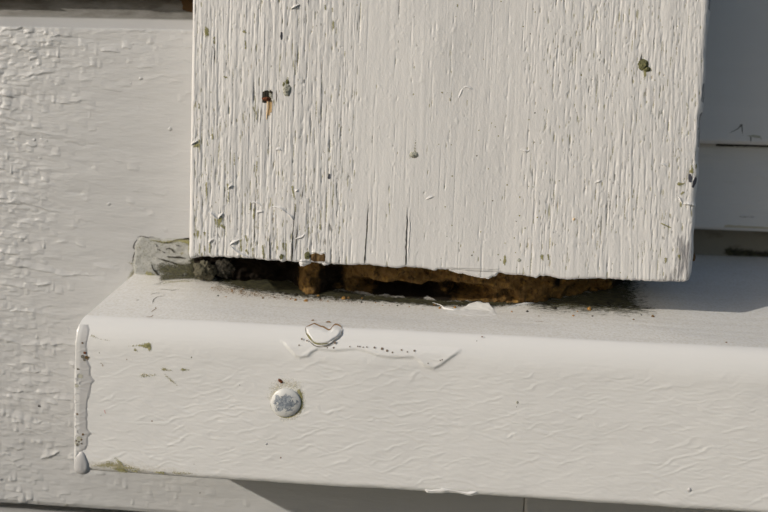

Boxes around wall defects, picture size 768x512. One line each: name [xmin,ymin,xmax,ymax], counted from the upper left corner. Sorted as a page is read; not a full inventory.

spalling [299,249,330,266]
damp [146,239,654,316]
peeling [447,266,499,279]